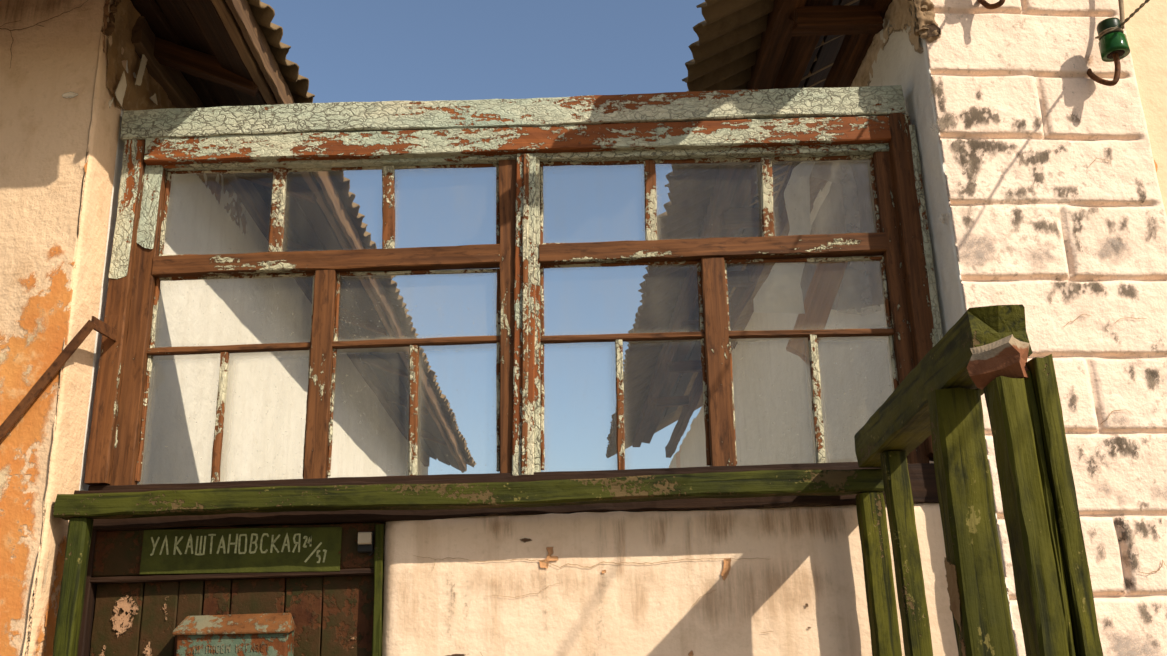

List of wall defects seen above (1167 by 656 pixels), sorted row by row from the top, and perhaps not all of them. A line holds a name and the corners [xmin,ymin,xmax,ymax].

flaking render [101,0,176,110]
flaking render [851,0,941,87]
flaking render [196,173,247,234]
peeling [0,246,76,656]
crack [414,555,764,598]